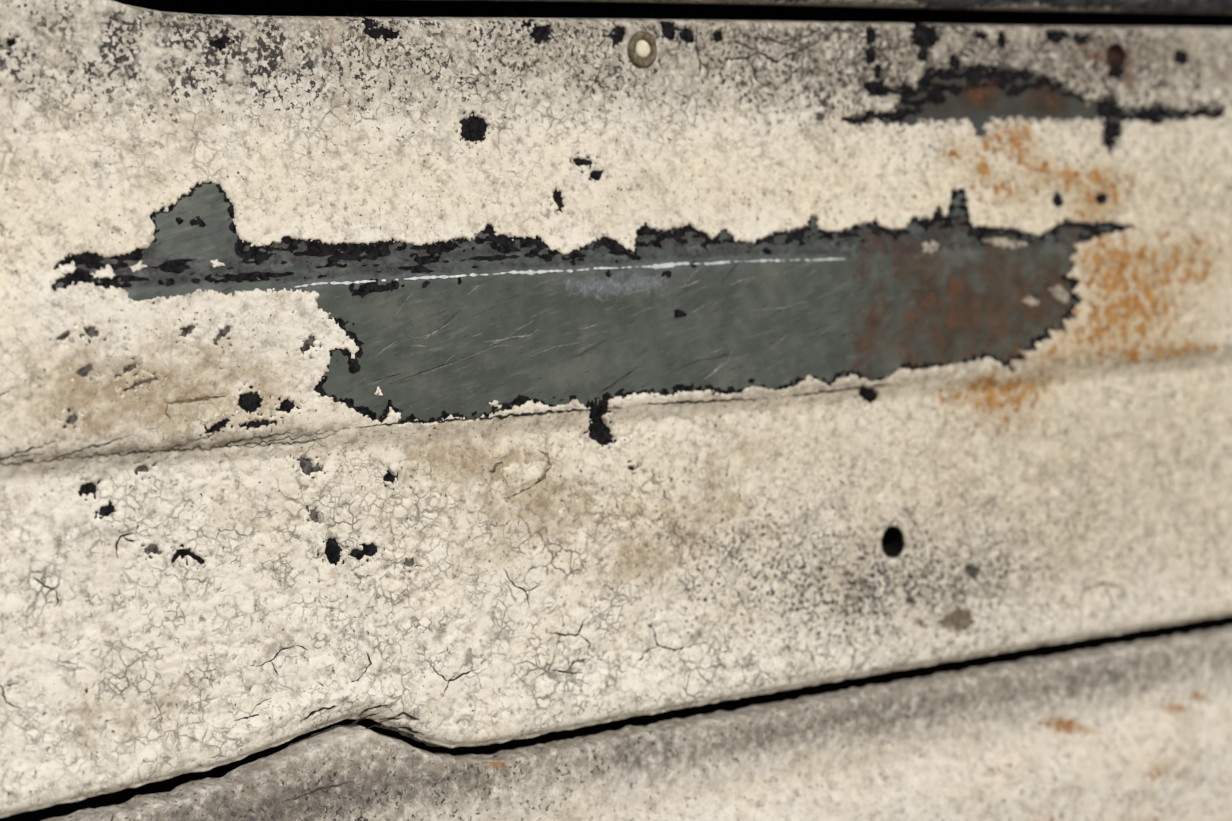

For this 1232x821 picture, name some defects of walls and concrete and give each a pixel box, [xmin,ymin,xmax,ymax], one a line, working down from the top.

peeling [645,13,697,51]
peeling [709,28,723,49]
peeling [841,0,1232,155]
peeling [810,95,831,127]
corrosion [939,119,1222,437]
peeling [50,181,1134,449]
crack [115,532,137,559]
crack [505,570,540,607]
crack [549,616,593,674]
crack [235,645,307,721]
crack [316,651,372,687]
crack [430,664,479,696]